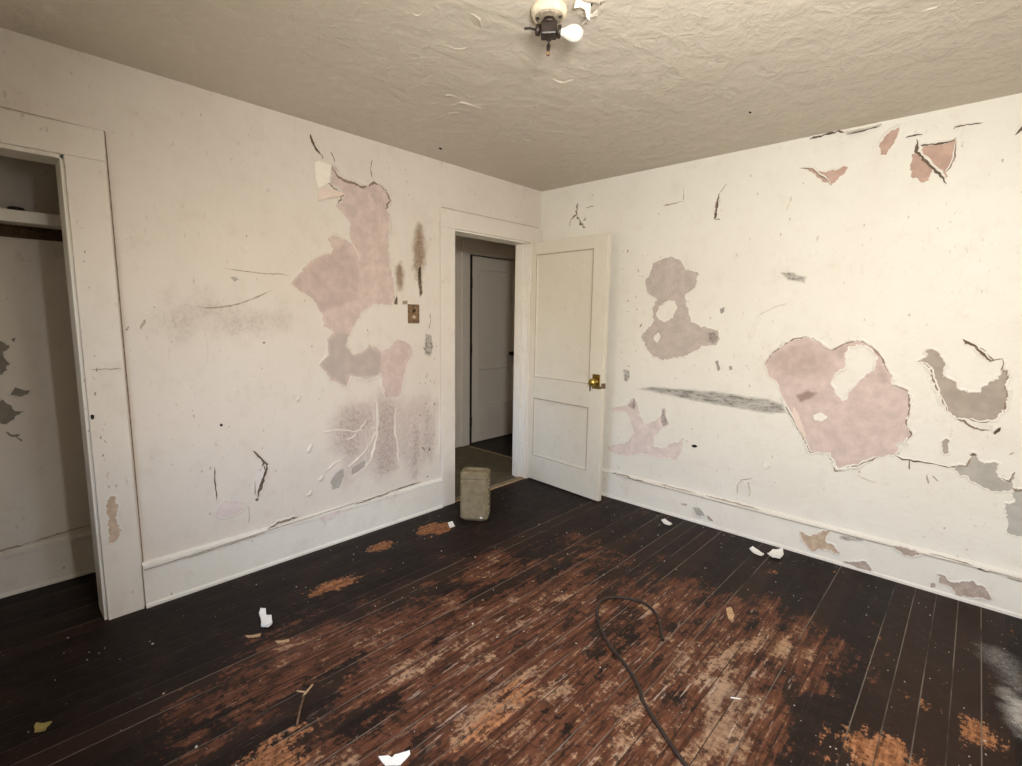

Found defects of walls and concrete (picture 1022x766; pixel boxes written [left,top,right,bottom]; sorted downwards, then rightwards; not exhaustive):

peeling [800,165,849,186]
peeling [910,137,956,184]
peeling [289,161,437,399]
peeling [627,255,721,361]
peeling [0,338,16,377]
peeling [0,385,32,426]
peeling [606,397,693,461]
peeling [762,335,916,472]
peeling [915,346,1014,431]
peeling [103,485,123,545]
peeling [939,437,1022,538]
peeling [930,572,994,602]